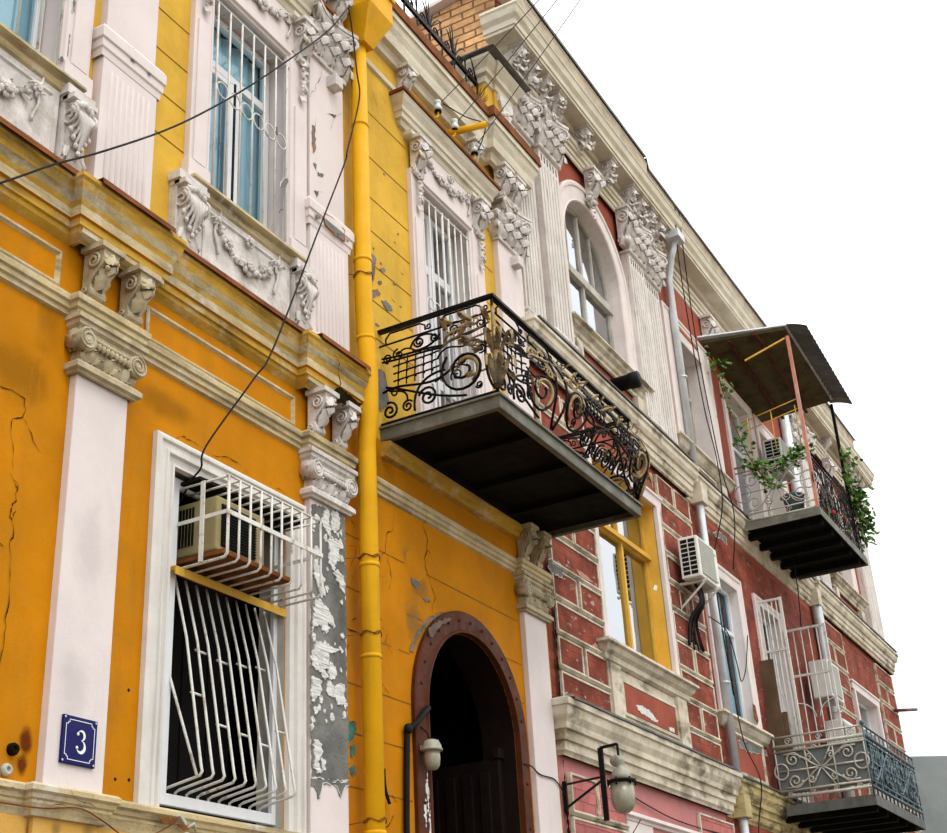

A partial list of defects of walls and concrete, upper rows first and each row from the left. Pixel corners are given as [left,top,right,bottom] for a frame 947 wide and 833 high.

spalling [312,125,324,177]
flaking render [371,248,402,311]
crack [0,386,39,662]
spalling [309,504,356,799]
flaking render [410,611,453,652]
peeling [636,705,658,722]